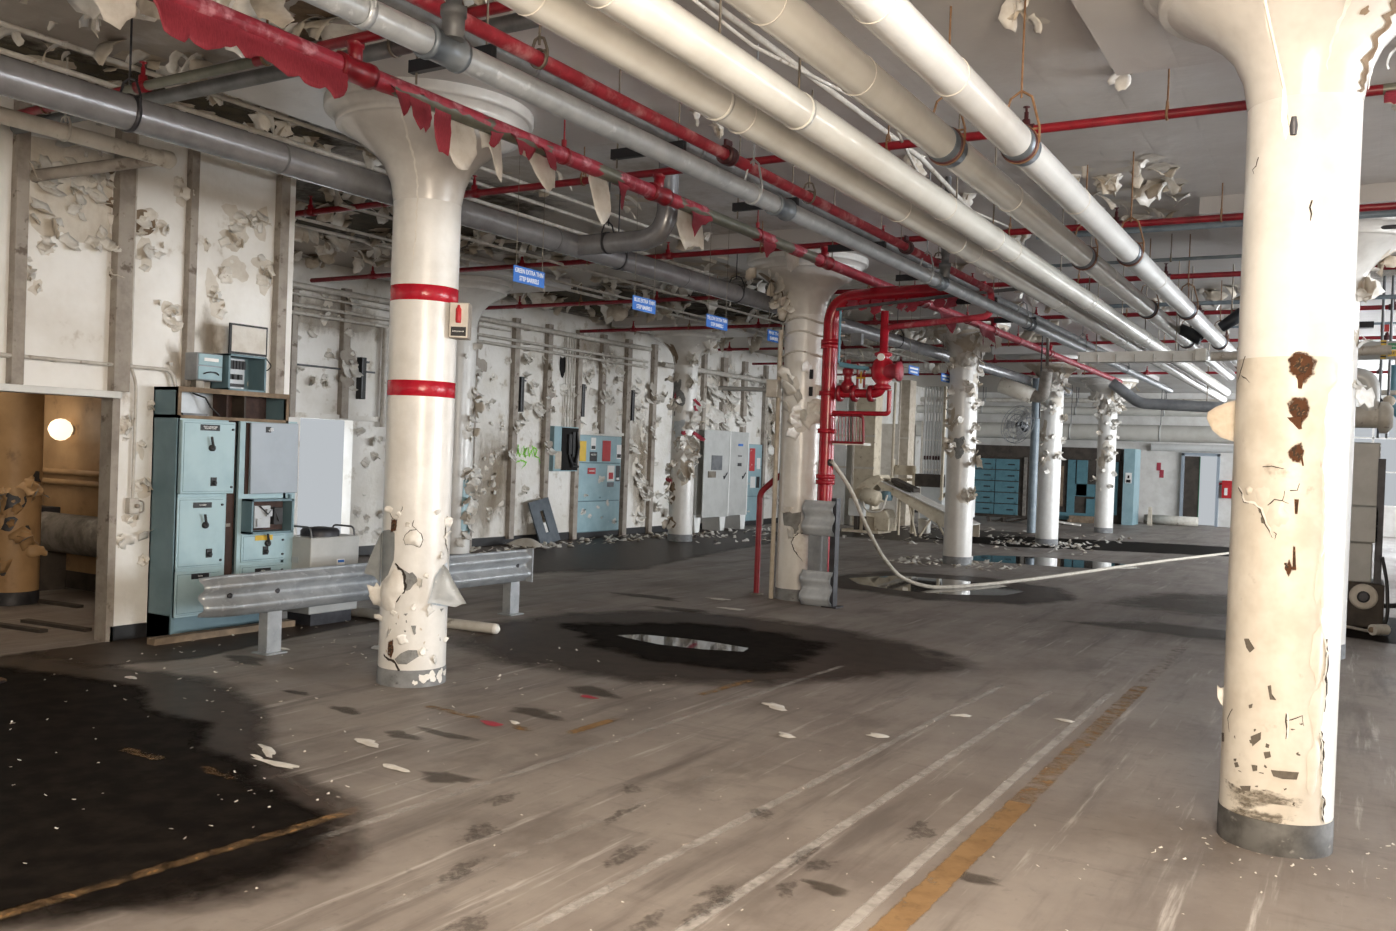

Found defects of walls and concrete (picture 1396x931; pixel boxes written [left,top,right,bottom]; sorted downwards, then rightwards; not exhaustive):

peeling [67,0,335,157]
peeling [212,0,364,52]
peeling [27,136,170,295]
peeling [1057,153,1195,221]
peeling [436,209,838,566]
peeling [1024,358,1140,491]
corrosion [1287,351,1317,466]
crack [1238,466,1300,538]
water stain [281,616,379,640]
peeling [352,493,449,685]
water stain [460,593,962,697]
water stain [0,631,358,928]